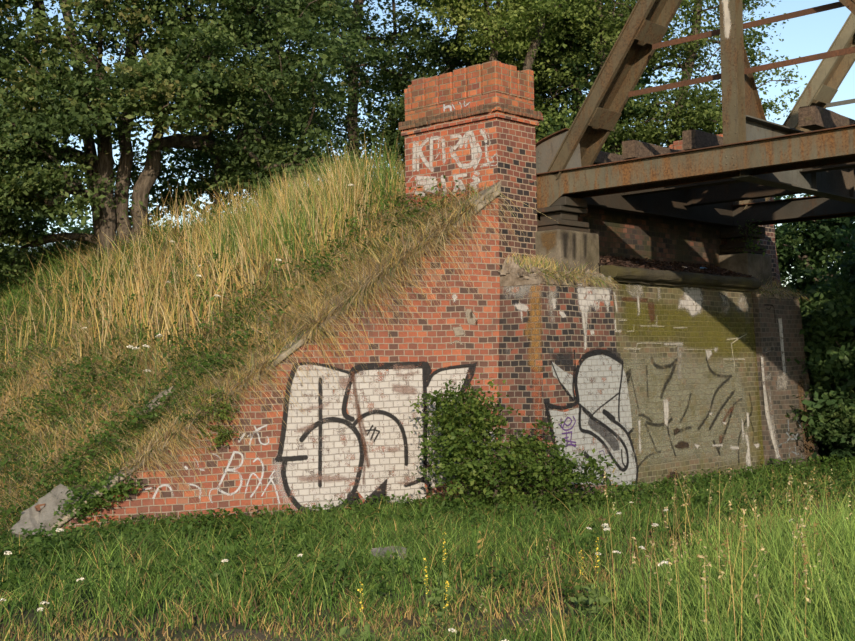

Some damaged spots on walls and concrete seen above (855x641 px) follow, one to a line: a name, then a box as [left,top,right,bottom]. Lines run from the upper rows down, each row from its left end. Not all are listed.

spalling [498,255,643,289]
damp [577,277,617,349]
damp [679,287,703,315]